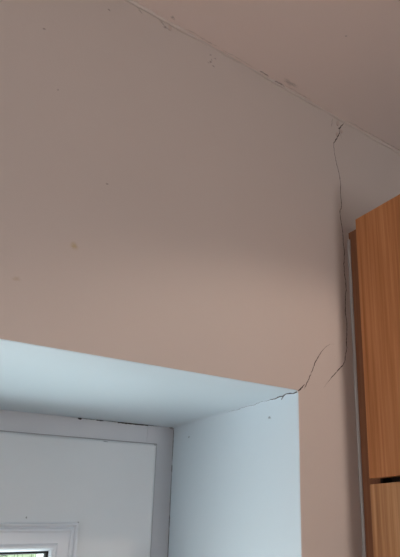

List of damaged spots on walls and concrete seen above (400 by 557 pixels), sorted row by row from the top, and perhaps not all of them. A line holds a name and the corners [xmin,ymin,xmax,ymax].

crack [270,344,330,400]
crack [328,121,347,382]